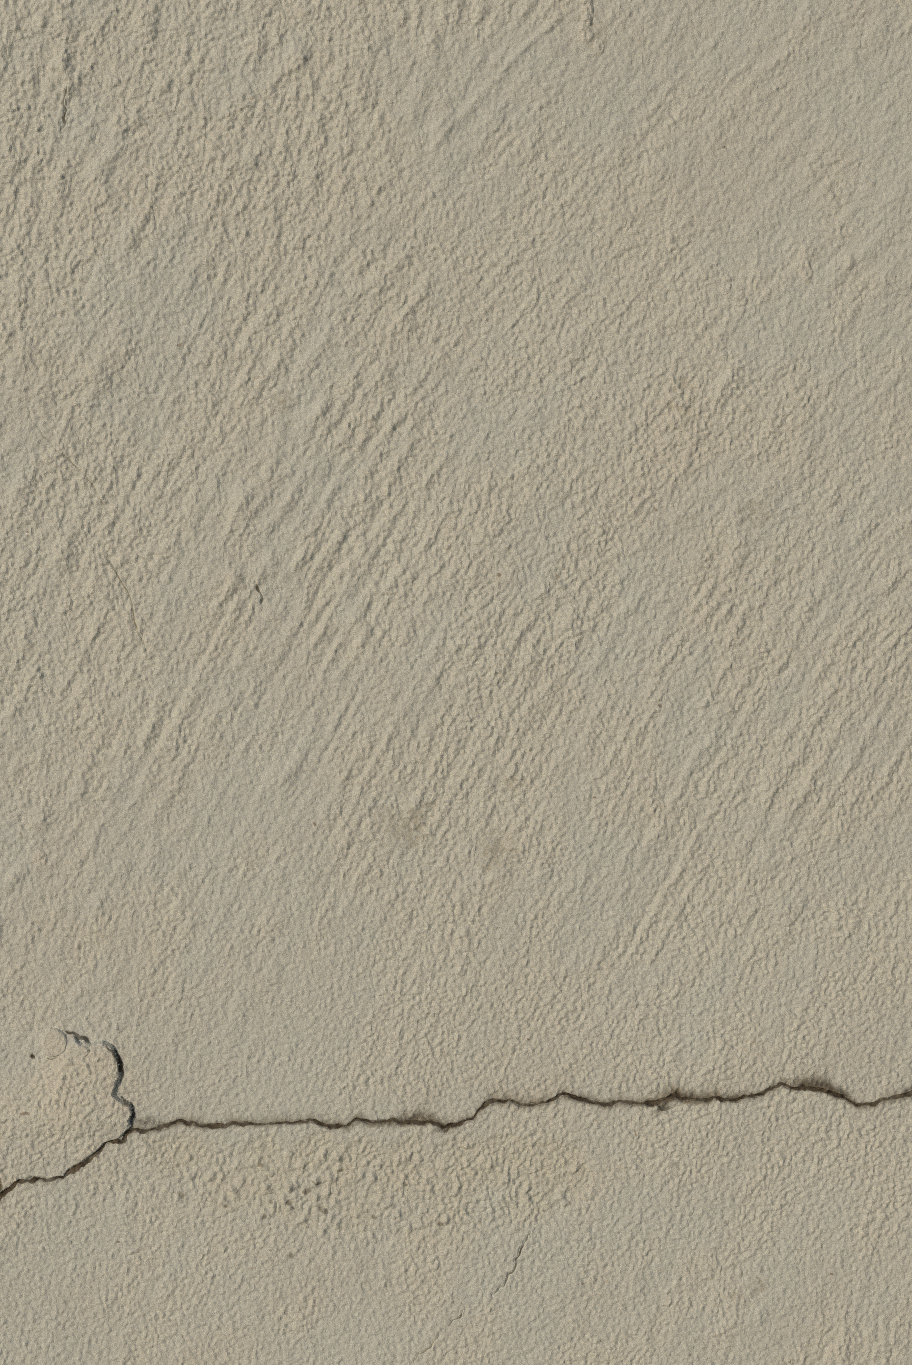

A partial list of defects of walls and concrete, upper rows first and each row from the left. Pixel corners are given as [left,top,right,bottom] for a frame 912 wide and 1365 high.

crack [0,1082,912,1200]